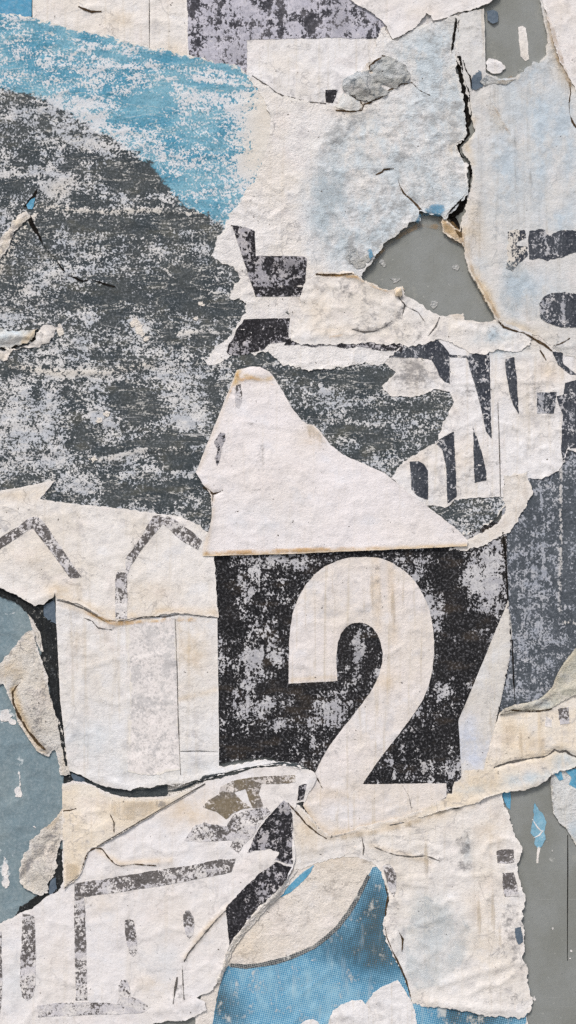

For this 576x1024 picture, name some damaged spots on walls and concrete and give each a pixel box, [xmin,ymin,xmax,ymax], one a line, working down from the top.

peeling [470,58,516,90]
peeling [518,26,529,61]
crack [446,18,472,238]
crack [24,189,116,287]
peeling [441,219,464,245]
peeling [531,802,553,863]